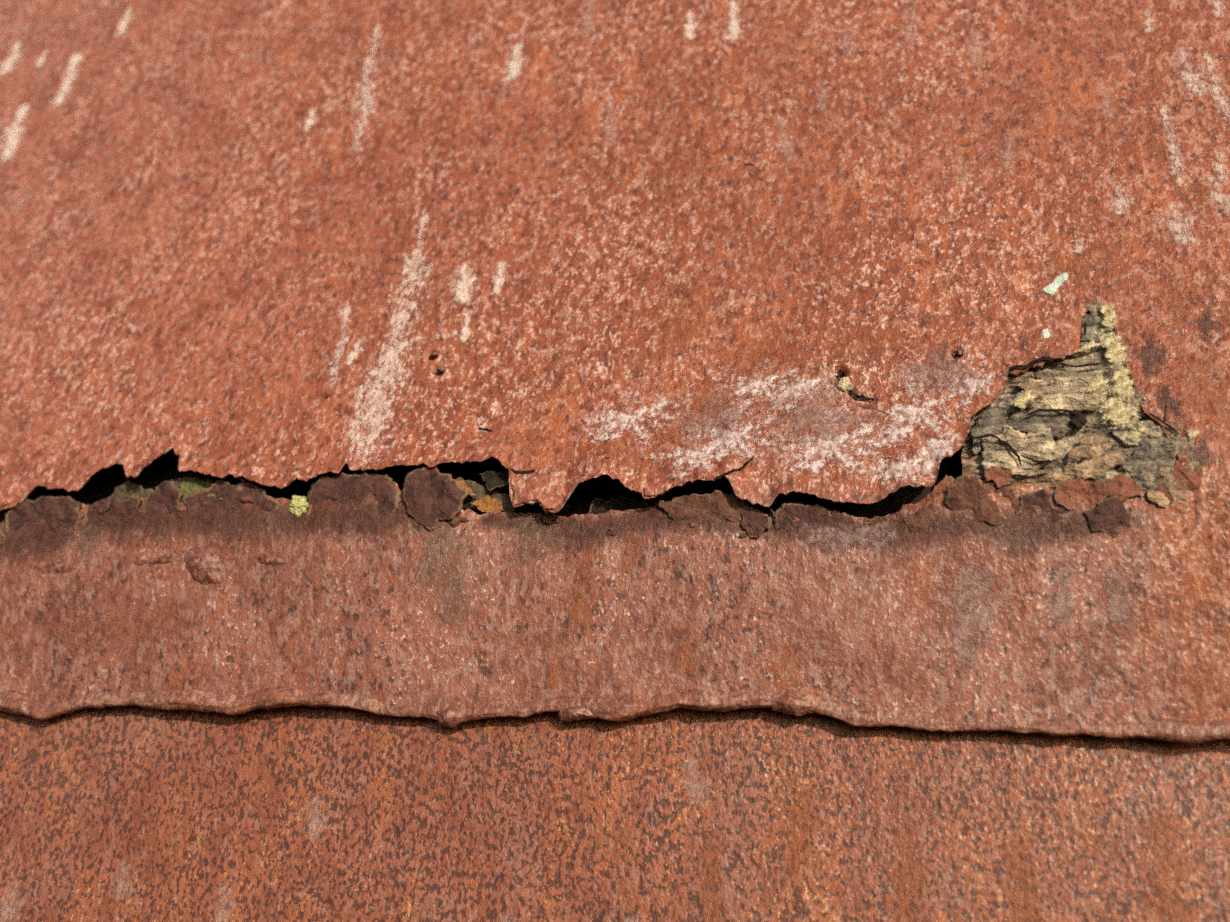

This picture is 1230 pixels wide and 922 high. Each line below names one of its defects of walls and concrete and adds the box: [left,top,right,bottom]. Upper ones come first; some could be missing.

efflorescence [585,357,994,481]
spalling [961,300,1203,508]